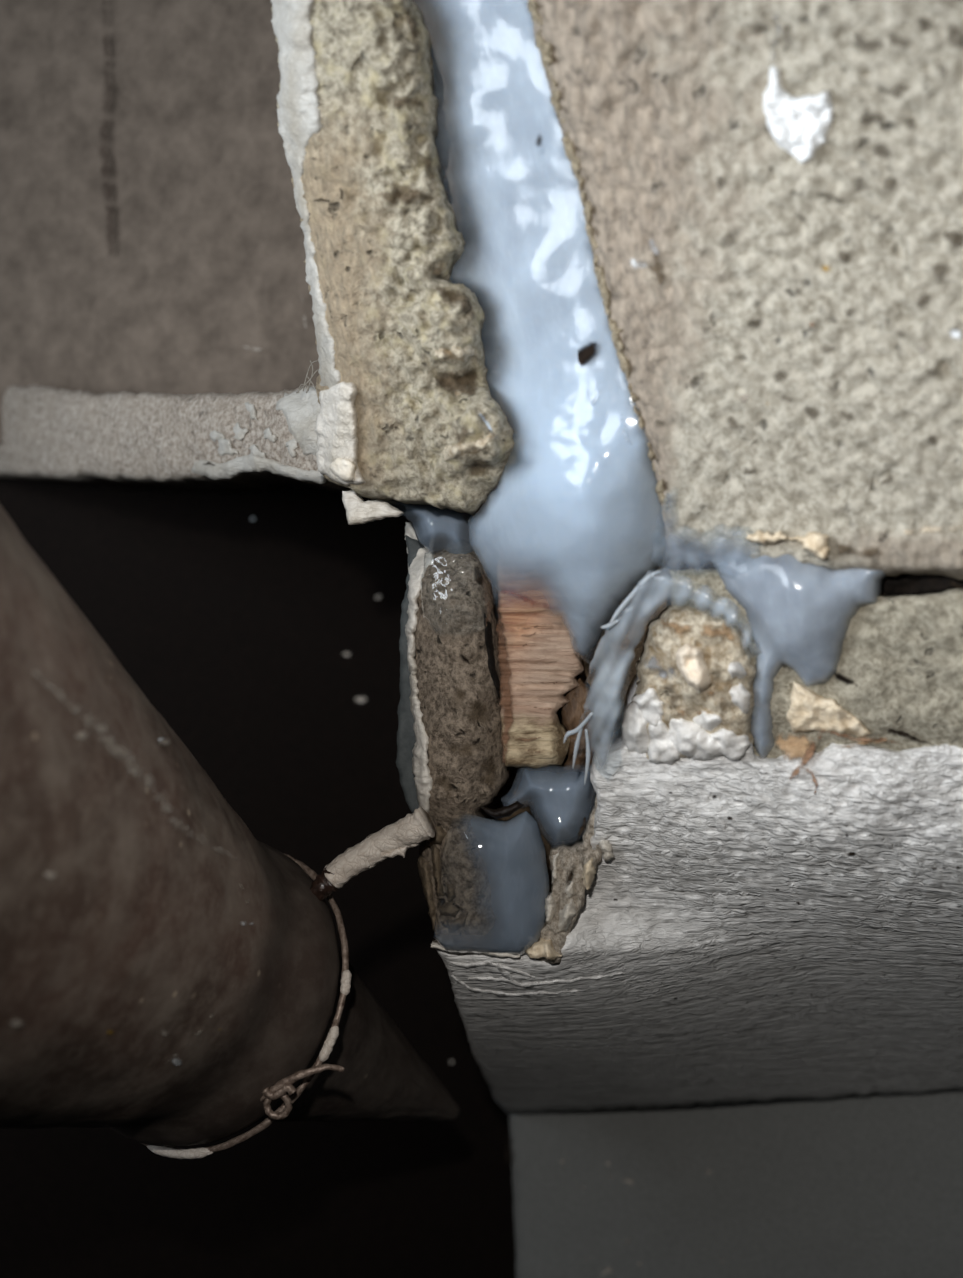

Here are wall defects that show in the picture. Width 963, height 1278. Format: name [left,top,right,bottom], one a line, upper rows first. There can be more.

crack [881,573,963,603]
spalling [418,825,468,935]
peeling [526,794,615,965]